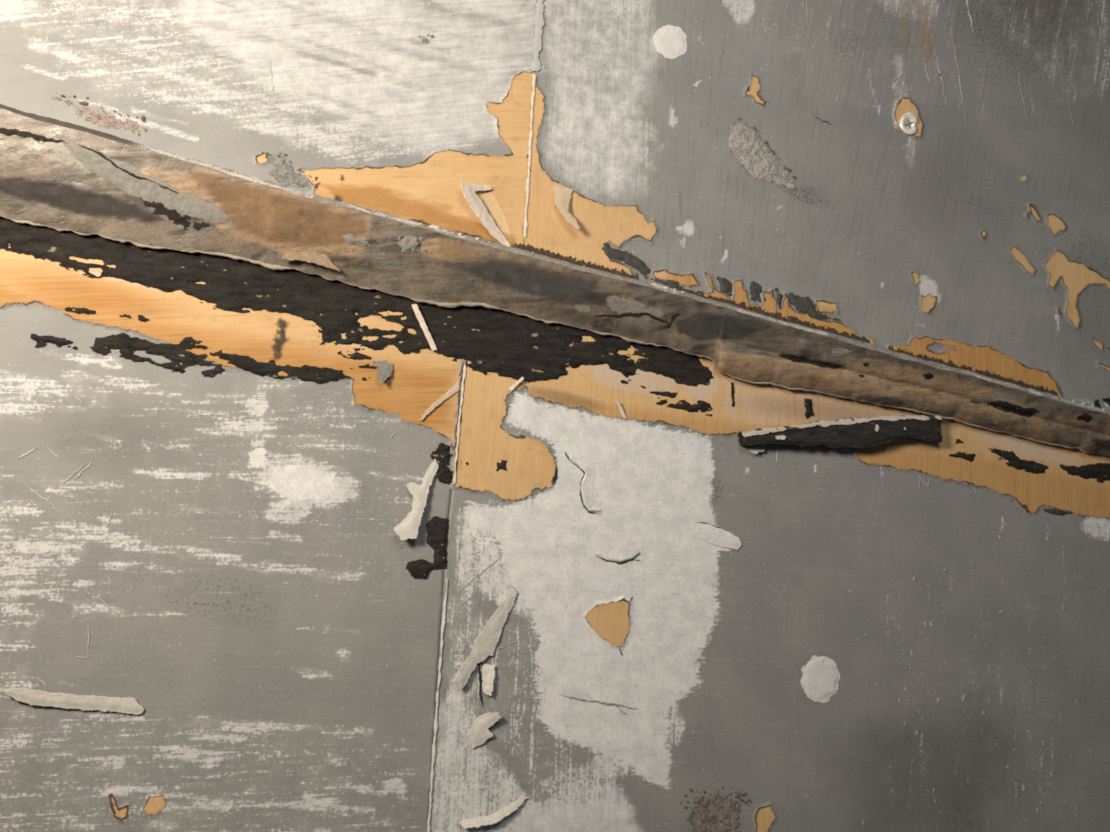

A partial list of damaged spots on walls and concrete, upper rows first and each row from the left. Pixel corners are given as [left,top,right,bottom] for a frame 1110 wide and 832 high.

peeling [52,131,231,224]
peeling [295,68,1065,398]
peeling [1007,201,1110,376]
peeling [0,244,1110,521]
crack [553,449,602,514]
crack [595,544,641,564]
peeling [692,523,742,550]
peeling [580,595,634,652]
peeling [482,664,495,696]
peeling [467,712,502,749]
peeling [105,789,171,824]
peeling [751,801,779,832]